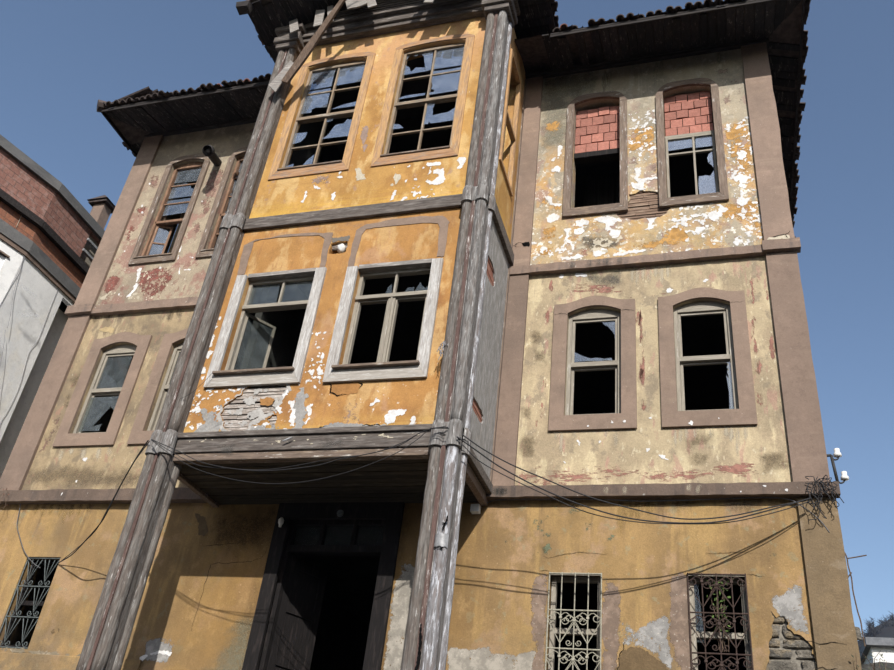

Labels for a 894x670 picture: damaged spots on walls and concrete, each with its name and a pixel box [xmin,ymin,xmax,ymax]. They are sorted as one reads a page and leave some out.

peeling [301,171,343,203]
peeling [390,162,445,201]
peeling [522,110,790,260]
peeling [100,246,191,301]
flaking render [185,316,248,442]
flaking render [139,638,174,663]
flaking render [383,563,415,670]
flaking render [766,585,817,670]